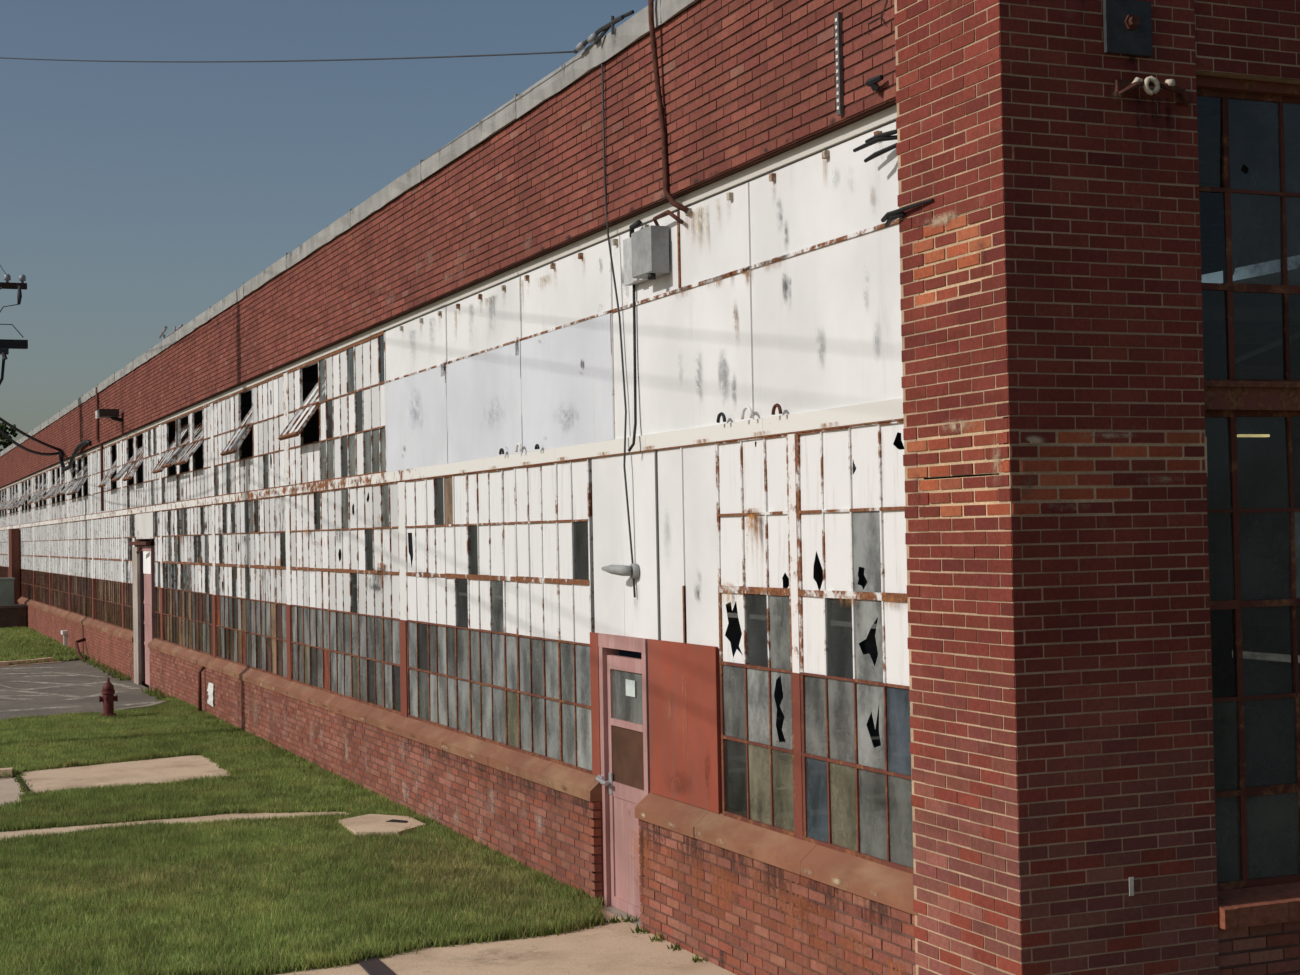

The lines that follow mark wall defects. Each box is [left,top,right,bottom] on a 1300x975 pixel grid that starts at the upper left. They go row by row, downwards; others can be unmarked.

damp [719,359,735,400]
peeling [366,563,384,589]